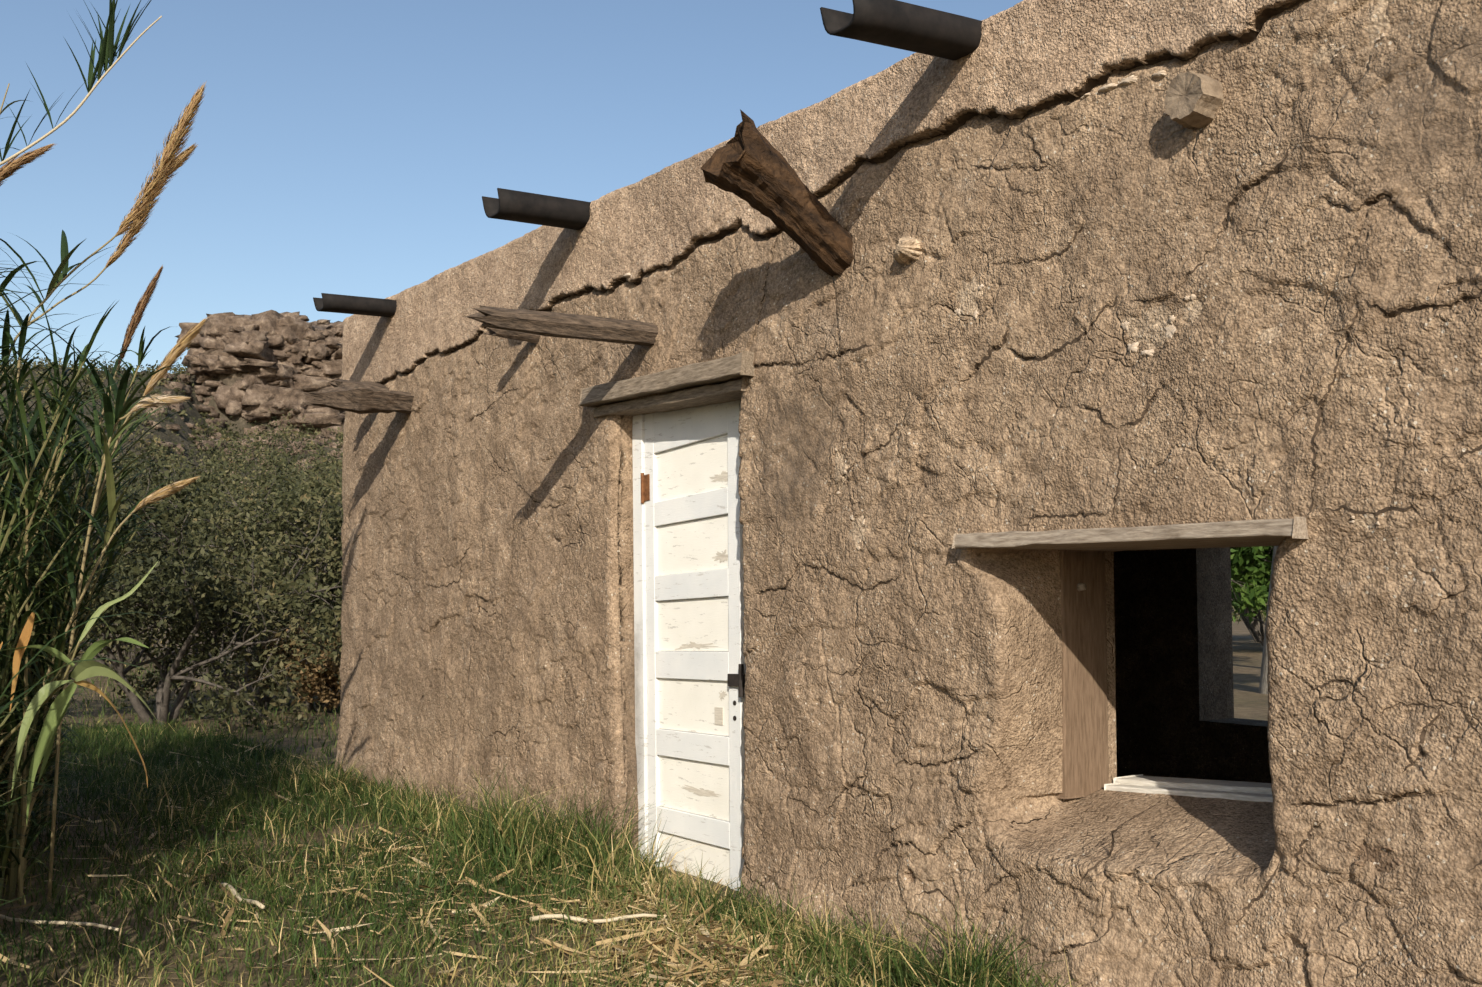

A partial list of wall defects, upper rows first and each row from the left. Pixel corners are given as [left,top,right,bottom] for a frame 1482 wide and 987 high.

crack [973,118,1050,197]
crack [748,234,874,367]
crack [958,135,1379,385]
crack [1284,193,1482,533]
crack [834,423,900,495]
crack [1029,386,1164,519]
crack [755,562,898,594]
crack [1399,582,1473,616]
crack [787,748,1054,947]
crack [1075,824,1121,885]
crack [1236,679,1482,923]
crack [1049,901,1114,957]